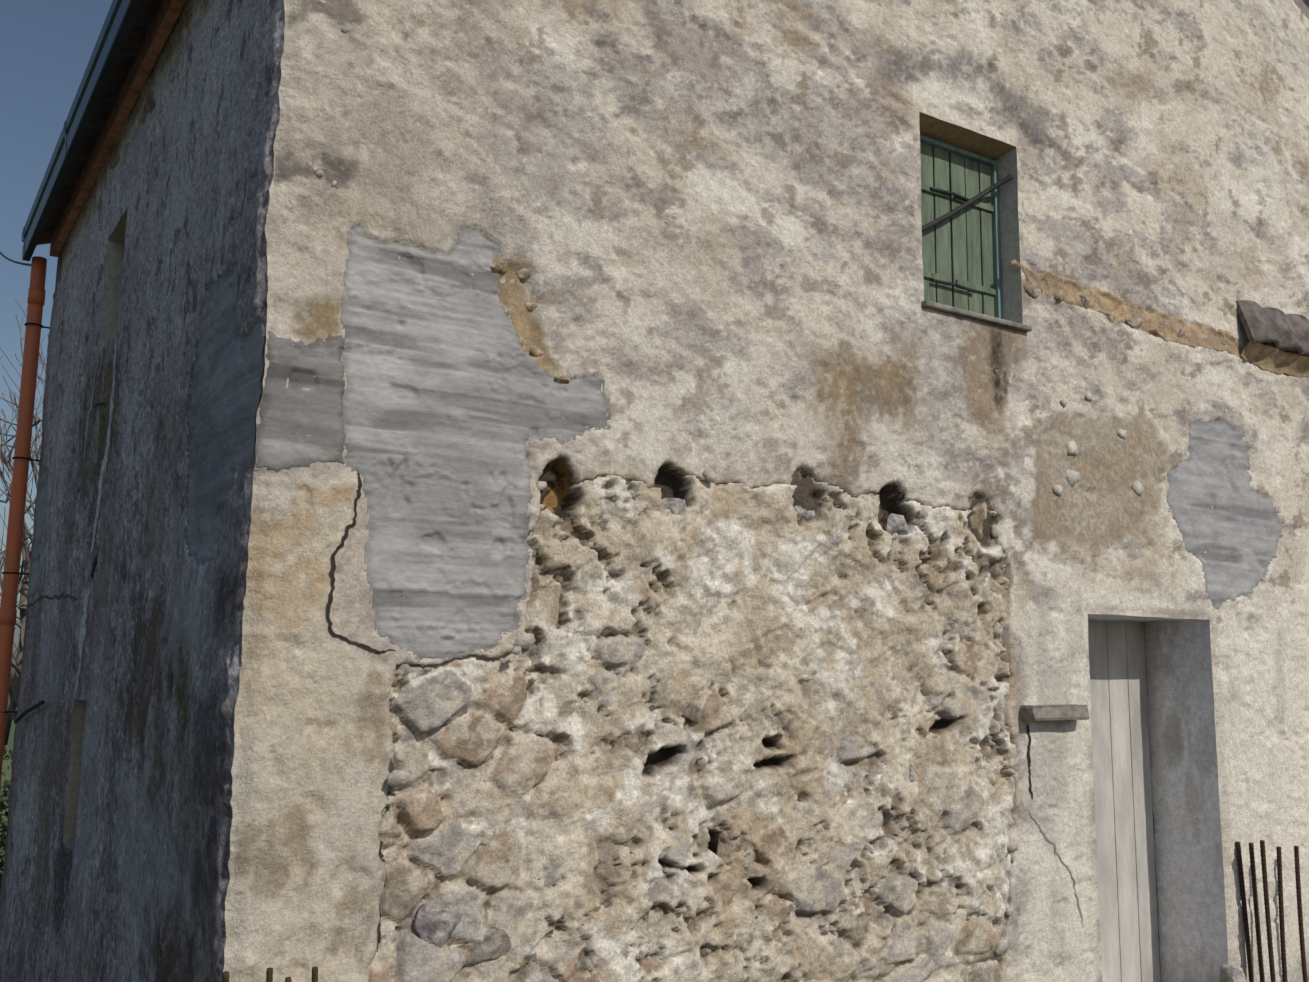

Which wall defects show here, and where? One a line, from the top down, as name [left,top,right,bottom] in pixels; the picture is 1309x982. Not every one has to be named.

spalling [490,257,570,384]
crack [27,554,97,607]
crack [326,469,395,654]
spalling [368,467,1018,982]
spalling [266,968,292,982]
spalling [1220,840,1309,982]